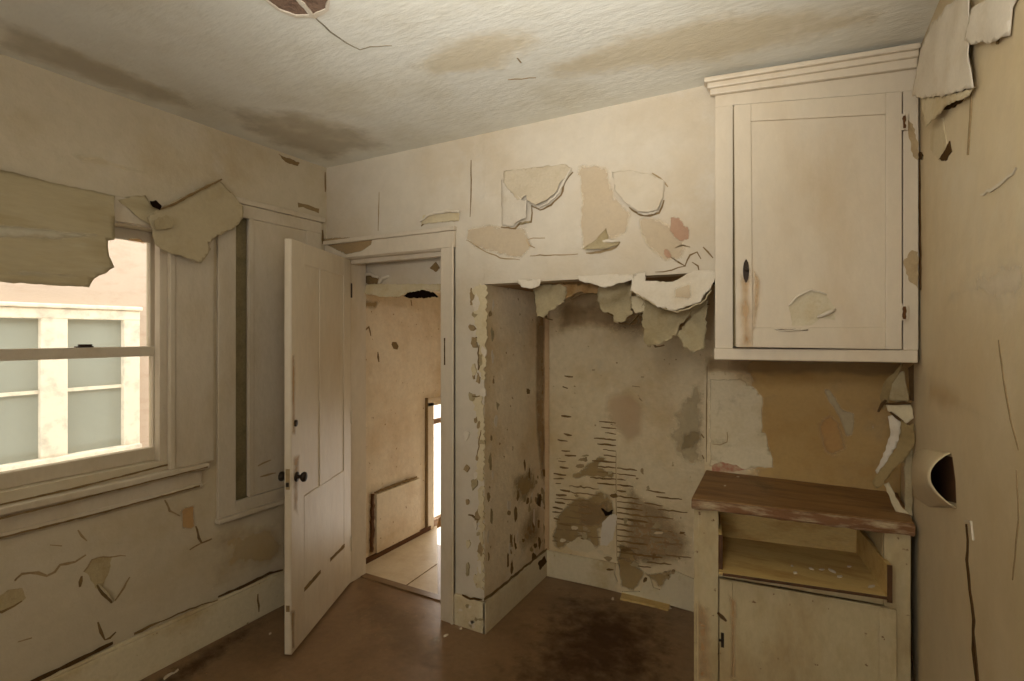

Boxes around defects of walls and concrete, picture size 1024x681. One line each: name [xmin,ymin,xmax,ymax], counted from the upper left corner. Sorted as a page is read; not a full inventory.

crack [315,18,392,50]
peeling [930,118,948,160]
peeling [612,170,689,241]
spalling [463,284,500,590]
flaking render [673,380,772,472]
peeling [507,460,547,574]
crack [0,554,86,613]
crack [97,622,116,640]
damp [618,546,670,589]
crack [964,520,979,681]